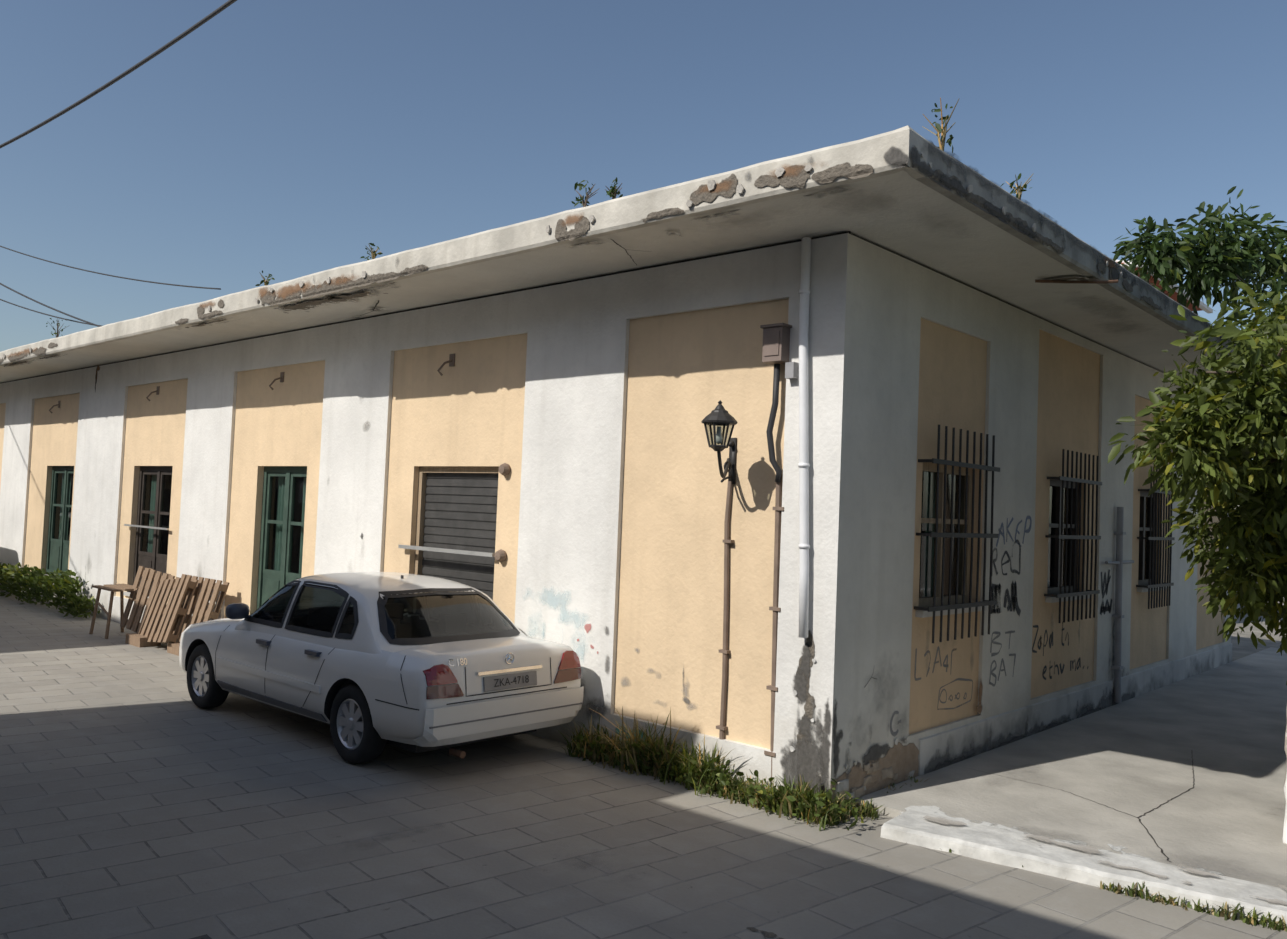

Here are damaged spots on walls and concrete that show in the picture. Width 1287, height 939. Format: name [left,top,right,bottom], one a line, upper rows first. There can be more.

spalling [641,146,1064,254]
spalling [545,215,601,246]
leakage [929,142,1236,345]
spalling [255,259,428,313]
spalling [175,299,227,328]